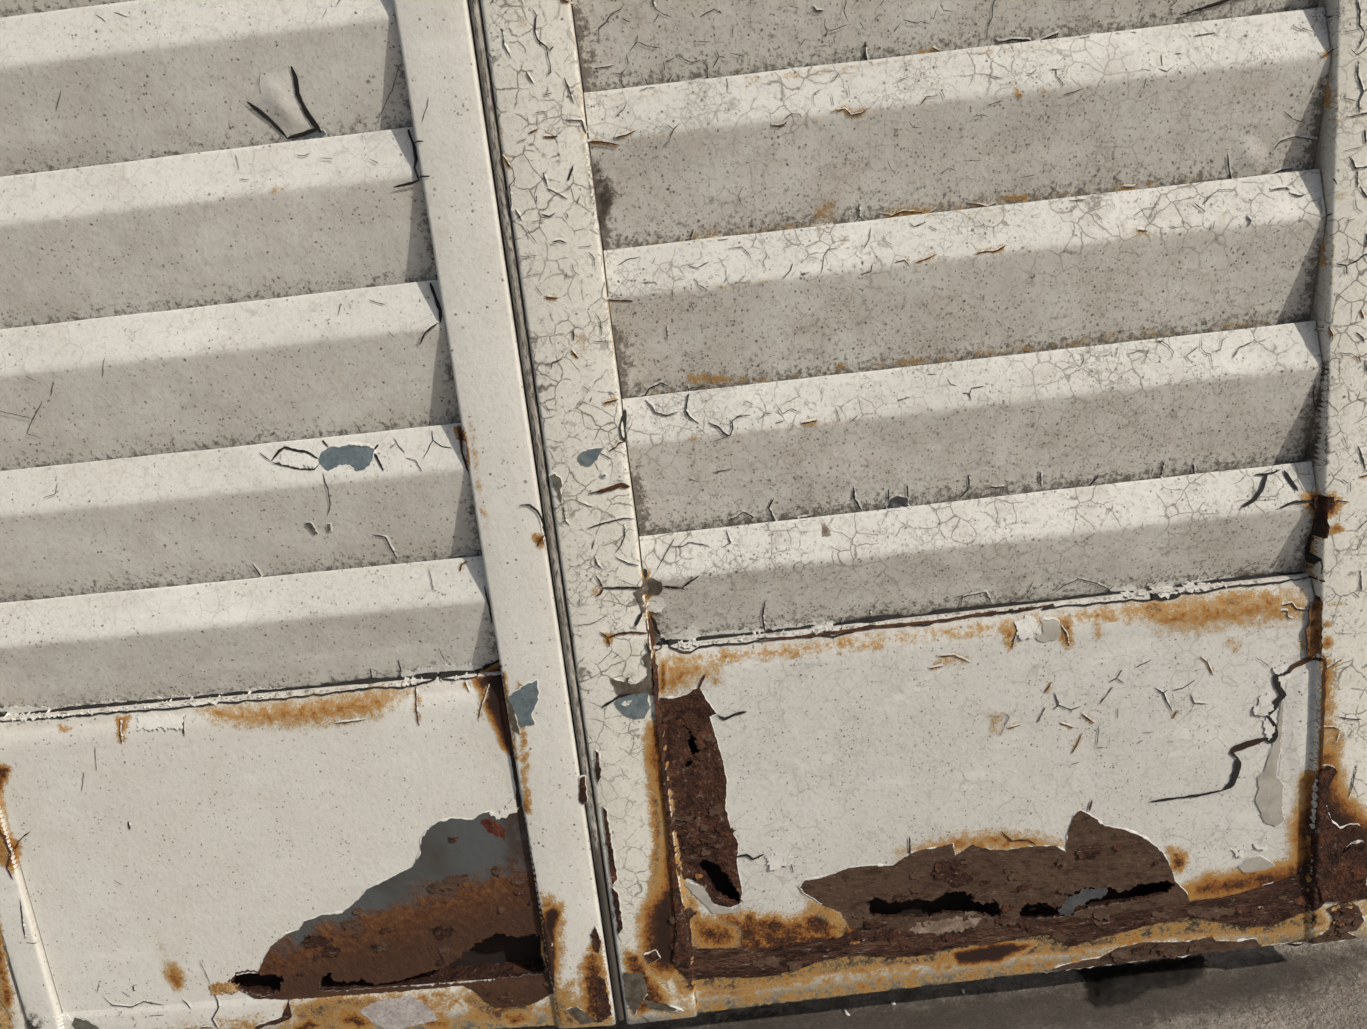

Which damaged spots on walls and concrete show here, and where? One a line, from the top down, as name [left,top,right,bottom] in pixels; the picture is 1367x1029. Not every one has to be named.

crack [490,0,1367,802]
peeling [260,440,384,535]
rust [1301,490,1345,582]
rust [633,571,1016,694]
rust [1032,589,1307,653]
peeling [508,679,540,734]
rust [202,602,1367,1029]
peeling [209,799,555,1029]
peeling [797,801,1190,936]
rust [0,926,16,1029]
rust [163,963,185,991]